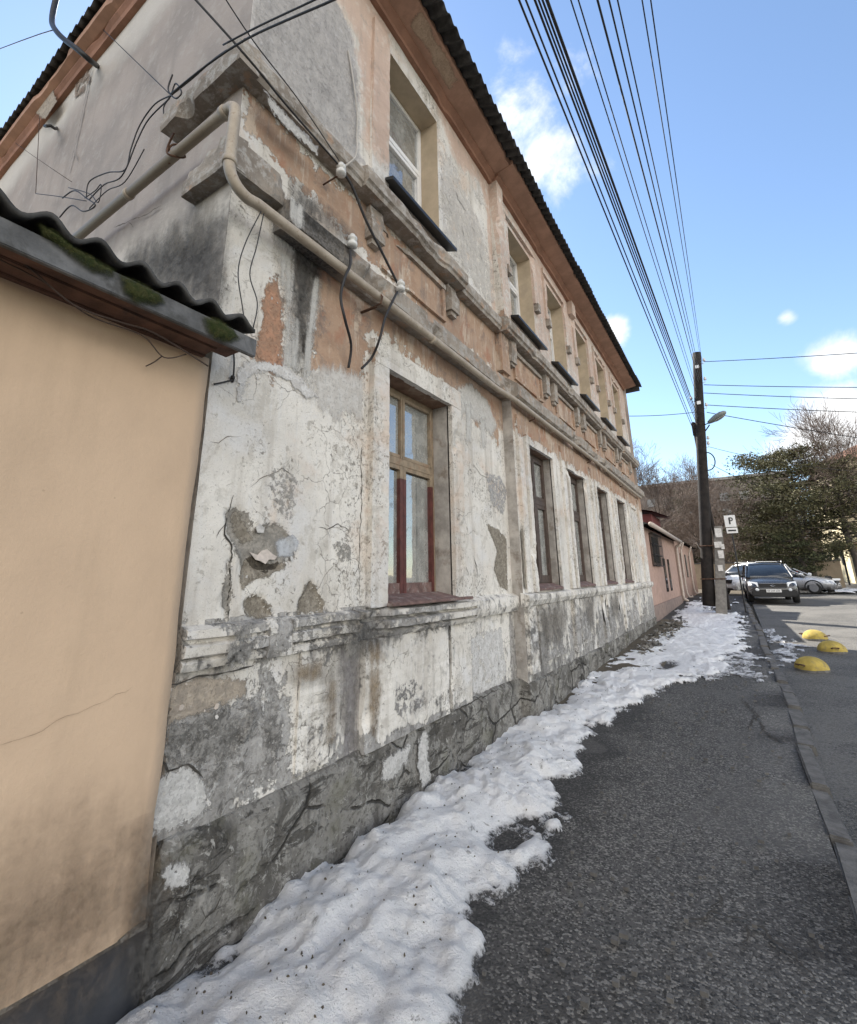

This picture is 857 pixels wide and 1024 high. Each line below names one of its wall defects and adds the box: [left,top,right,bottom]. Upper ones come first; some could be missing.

peeling [263,89,318,156]
damp [133,217,226,303]
peeling [236,282,318,402]
spalling [152,675,247,838]
crack [217,465,290,620]
spalling [222,467,298,619]
spalling [297,580,325,615]
crack [319,449,362,597]
damp [333,610,390,751]
crack [449,690,497,756]
spalling [488,524,508,590]
damp [542,606,565,639]